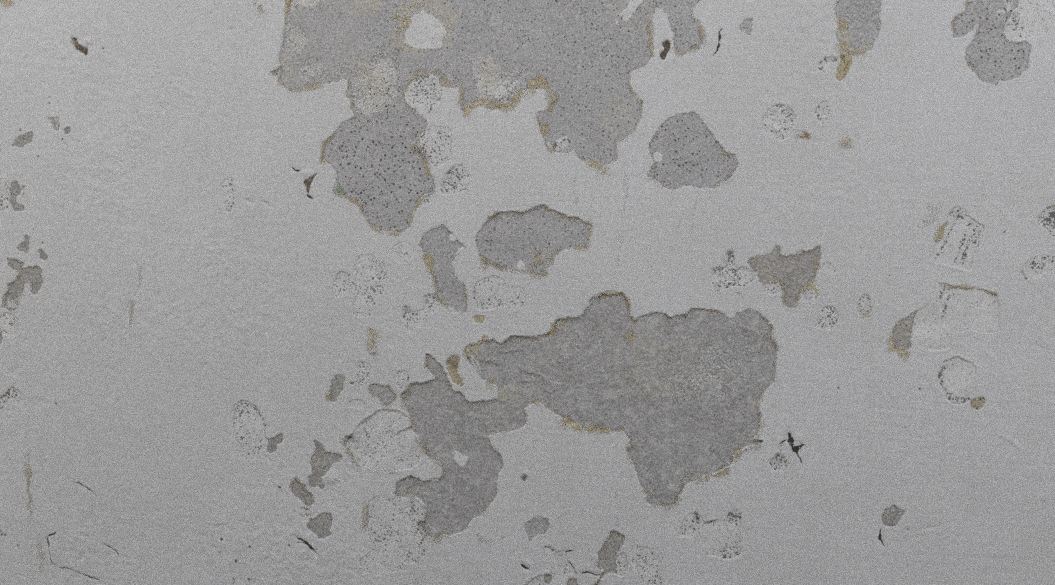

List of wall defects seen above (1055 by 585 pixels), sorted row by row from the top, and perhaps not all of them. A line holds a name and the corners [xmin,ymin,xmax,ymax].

peeling [835,0,881,81]
peeling [952,0,1032,85]
peeling [272,0,704,235]
peeling [648,112,738,189]
flaking render [10,181,24,211]
peeling [4,236,48,311]
peeling [420,205,592,323]
peeling [747,246,822,308]
flaking render [266,434,284,453]
peeling [368,291,778,543]
peeling [567,531,628,585]